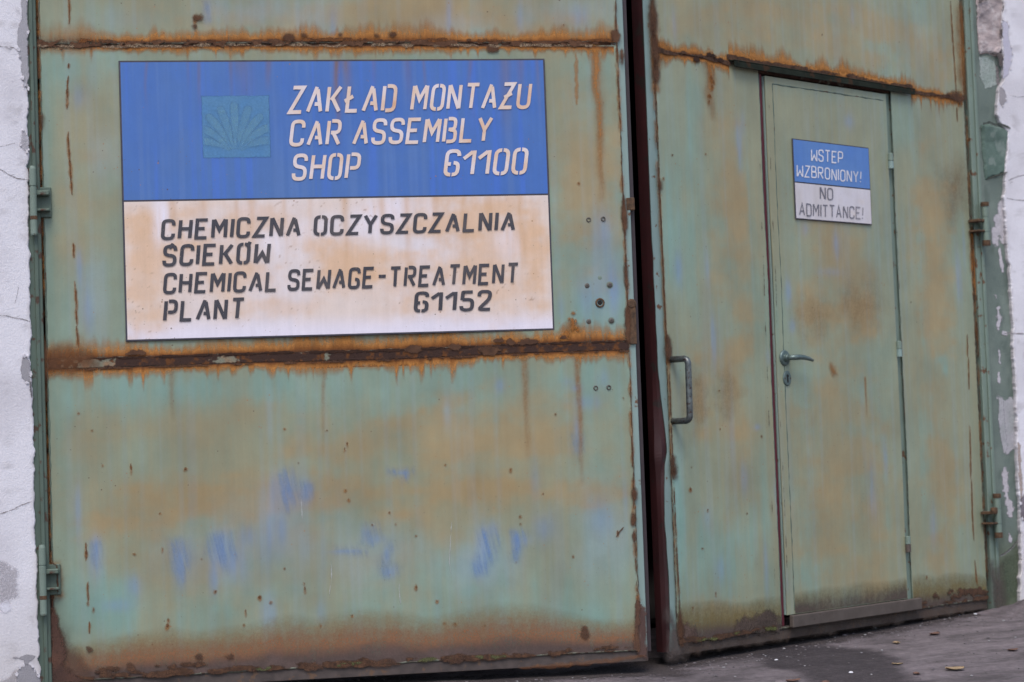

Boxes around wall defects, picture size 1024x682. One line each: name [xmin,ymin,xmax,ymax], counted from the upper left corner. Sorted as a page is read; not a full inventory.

corrosion [36,2,625,156]
corrosion [649,0,967,149]
flaking render [976,0,1013,107]
corrosion [44,155,631,400]
peeling [991,200,1004,272]
corrosion [657,162,989,652]
peeling [997,397,1024,521]
corrosion [47,413,648,682]